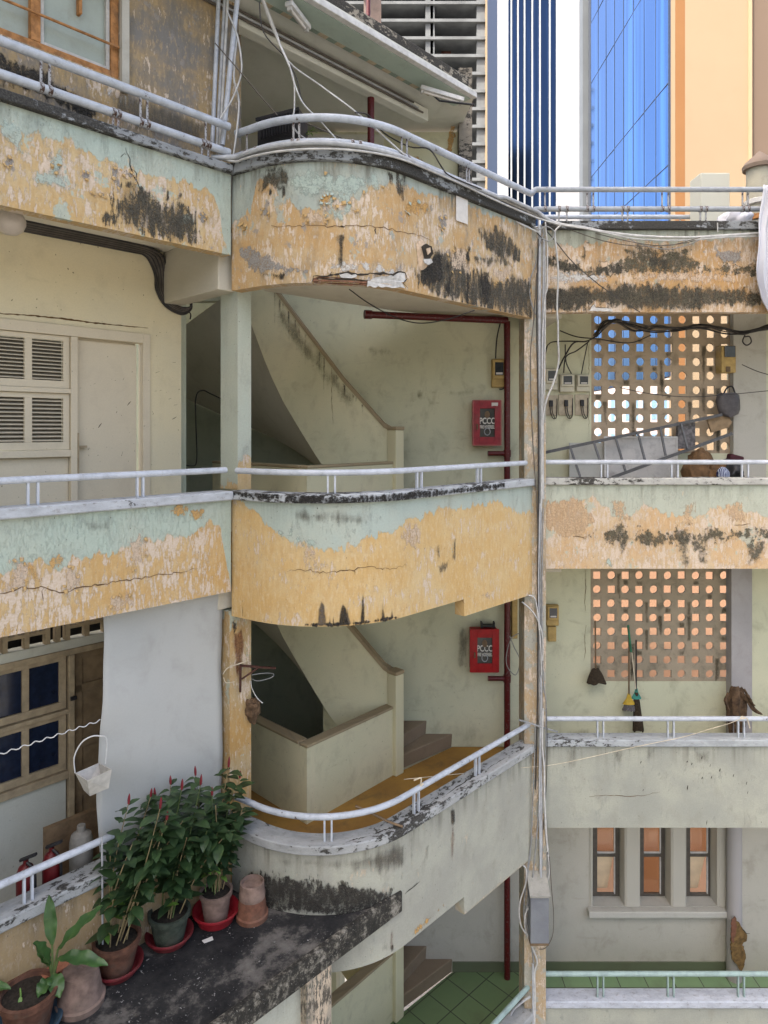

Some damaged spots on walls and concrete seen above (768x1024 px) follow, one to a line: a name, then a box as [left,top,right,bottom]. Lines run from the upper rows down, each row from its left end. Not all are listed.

peeling [81,166,137,198]
leakage [103,182,200,246]
peeling [291,170,385,224]
crack [271,225,428,239]
spalling [239,246,408,288]
leakage [415,225,533,318]
leakage [546,242,762,312]
peeling [172,505,204,520]
crack [0,568,194,597]
crack [287,566,399,574]
leakage [305,600,397,627]
leakage [249,871,393,915]